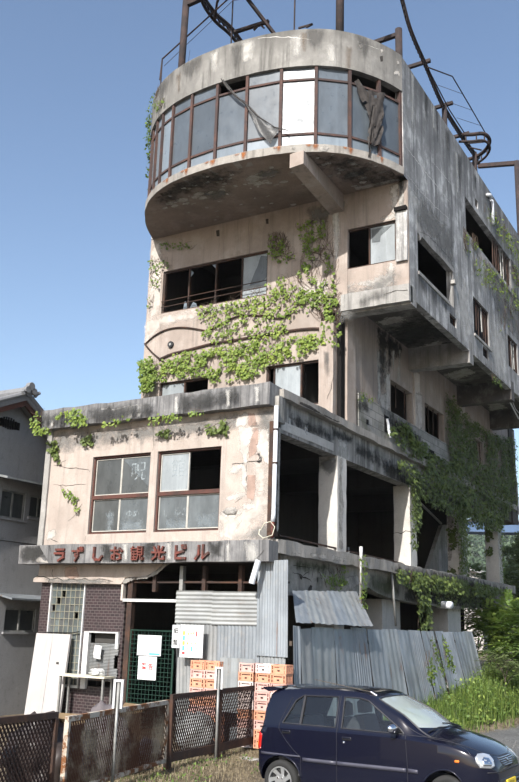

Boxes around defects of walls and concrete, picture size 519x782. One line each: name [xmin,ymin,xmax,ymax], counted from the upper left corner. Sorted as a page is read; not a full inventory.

leakage [233,44,251,62]
leakage [358,36,368,52]
leakage [425,93,461,192]
leakage [157,171,234,202]
leakage [314,156,403,220]
leakage [419,201,453,265]
leakage [378,314,447,397]
leakage [89,403,152,419]
leakage [176,387,238,412]
leakage [260,410,273,436]
flaking render [219,412,281,540]
leakage [289,417,465,506]